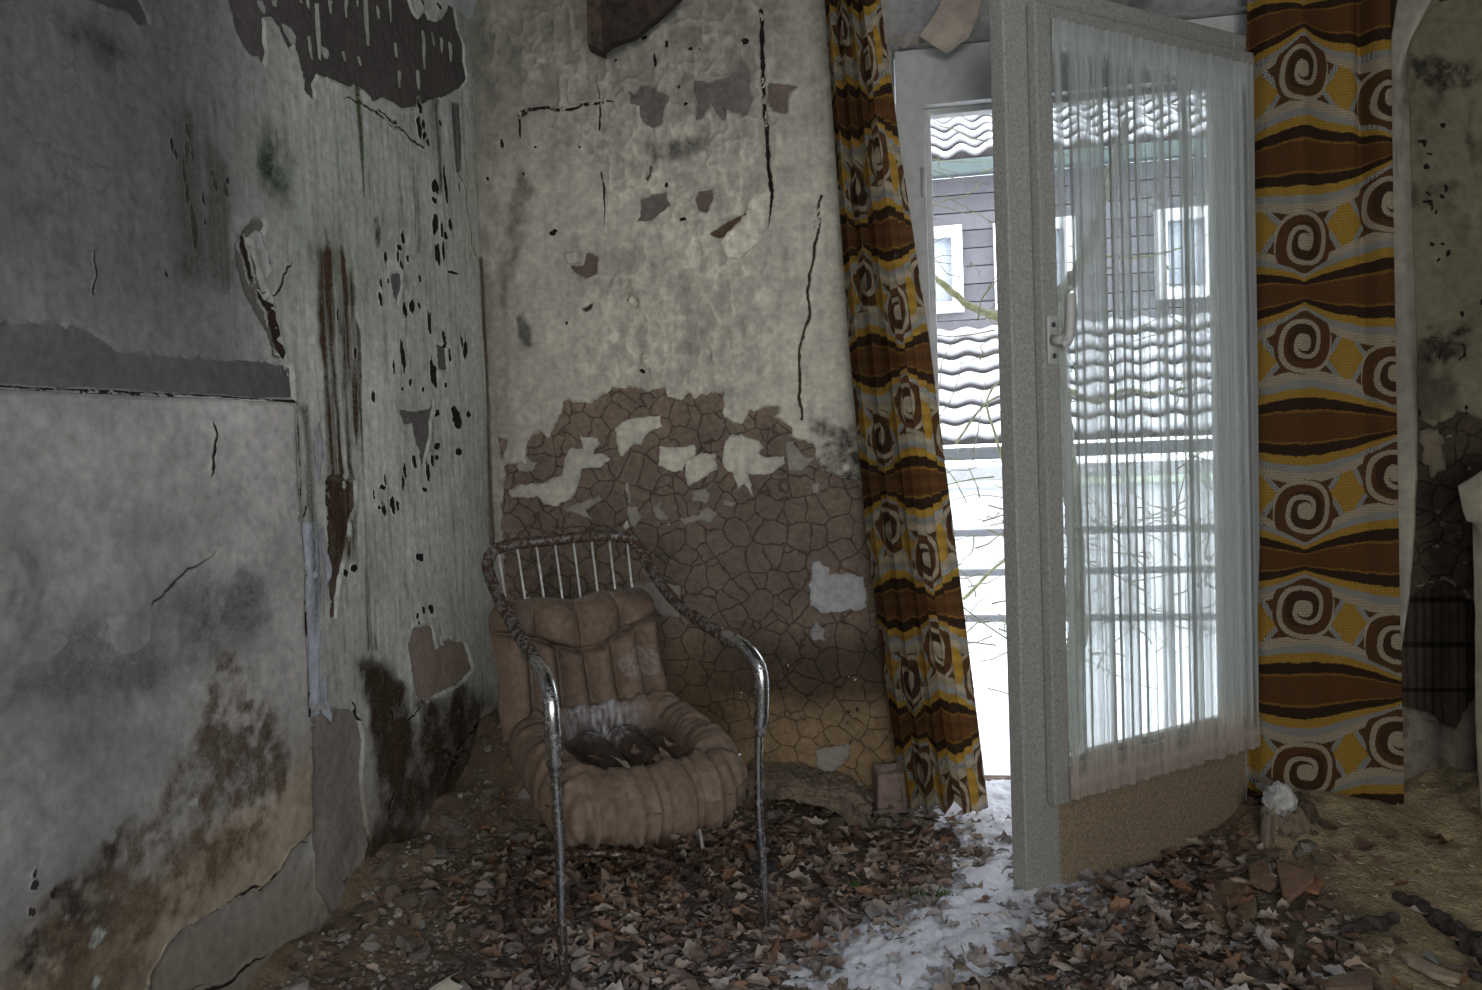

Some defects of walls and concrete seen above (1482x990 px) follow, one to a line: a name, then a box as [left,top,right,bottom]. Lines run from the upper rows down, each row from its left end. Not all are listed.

peeling [228,0,466,148]
crack [516,74,617,139]
crack [598,167,608,232]
crack [756,6,777,229]
water stain [1411,57,1470,92]
peeling [0,219,291,399]
spalling [372,230,472,518]
crack [794,194,827,421]
water stain [1417,327,1468,364]
peeling [498,368,897,791]
water stain [15,658,286,990]
water stain [358,659,484,858]